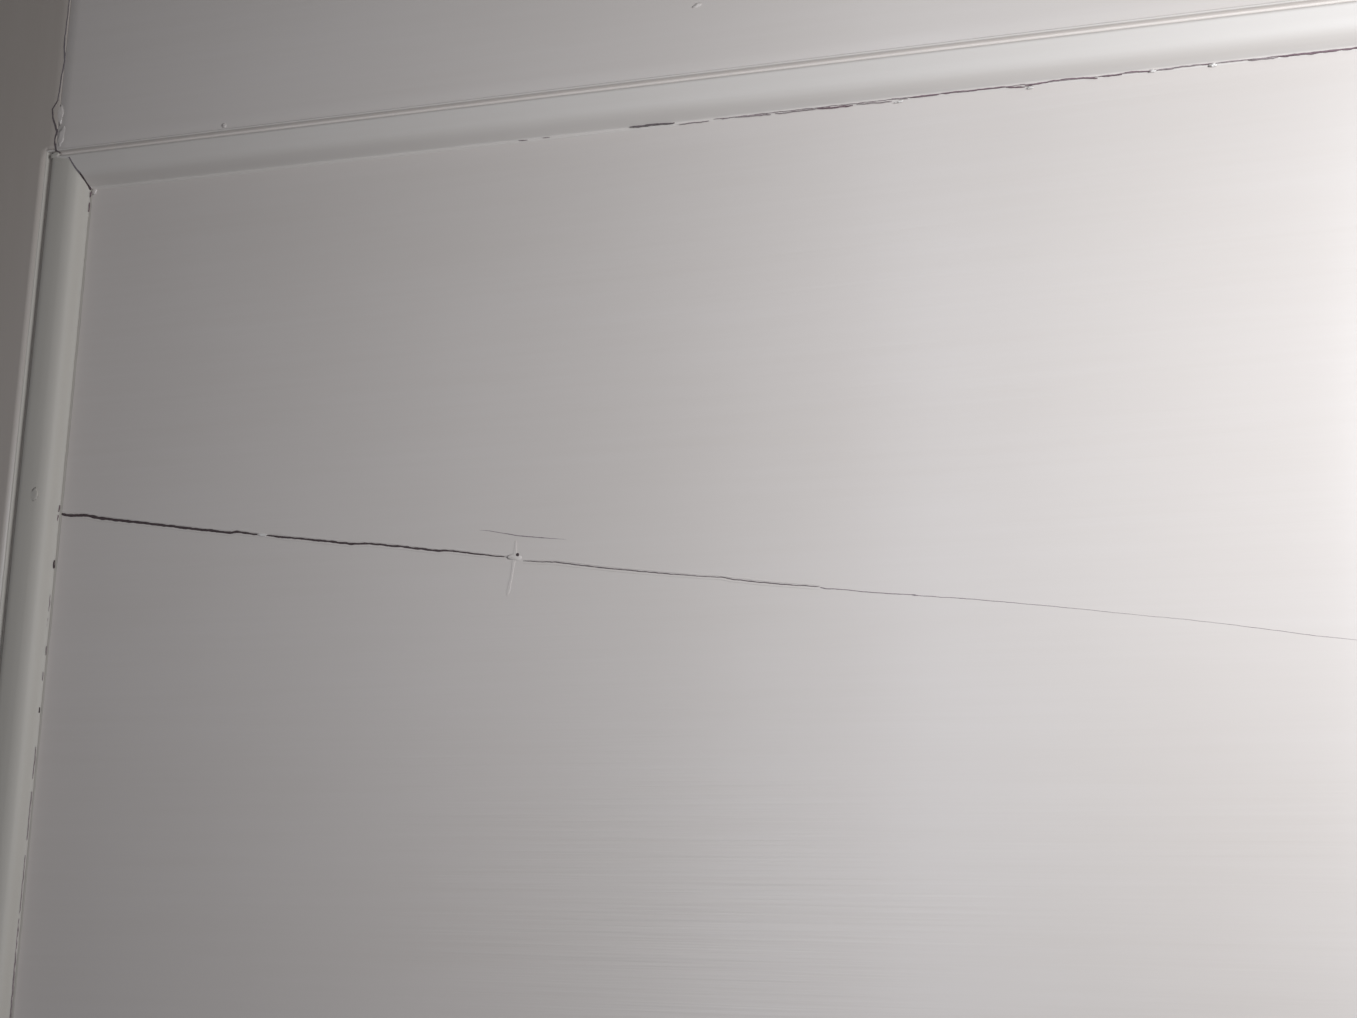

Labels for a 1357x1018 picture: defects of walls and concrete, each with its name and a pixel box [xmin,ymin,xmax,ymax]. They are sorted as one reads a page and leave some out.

crack [50,0,97,212]
crack [57,505,1354,640]
crack [10,748,36,1018]